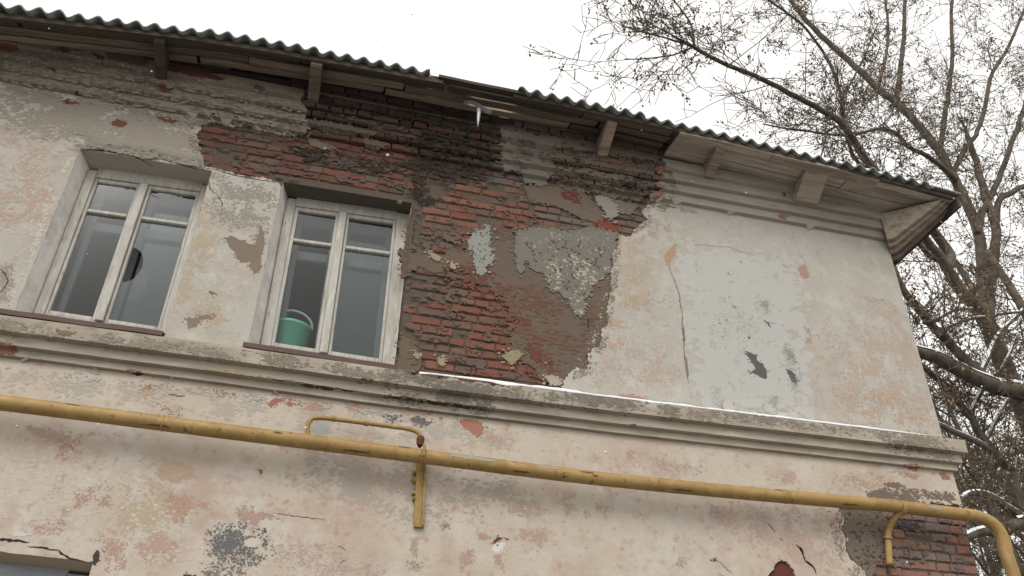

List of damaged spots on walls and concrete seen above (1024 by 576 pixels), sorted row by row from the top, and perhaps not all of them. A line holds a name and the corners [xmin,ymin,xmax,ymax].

flaking render [101,78,684,387]
crack [669,267,689,380]
spalling [459,415,489,437]
crack [0,538,90,563]
flaking render [844,503,979,576]